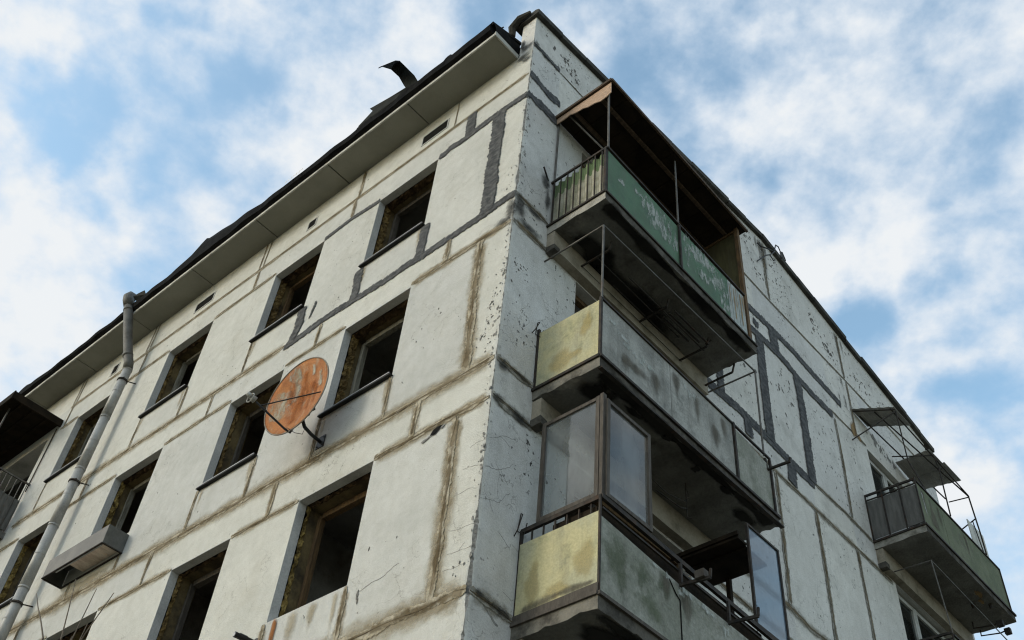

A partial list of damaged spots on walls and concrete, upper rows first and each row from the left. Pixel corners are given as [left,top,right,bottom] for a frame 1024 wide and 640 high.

damp [8,177,550,640]
crack [11,194,548,640]
damp [65,76,524,427]